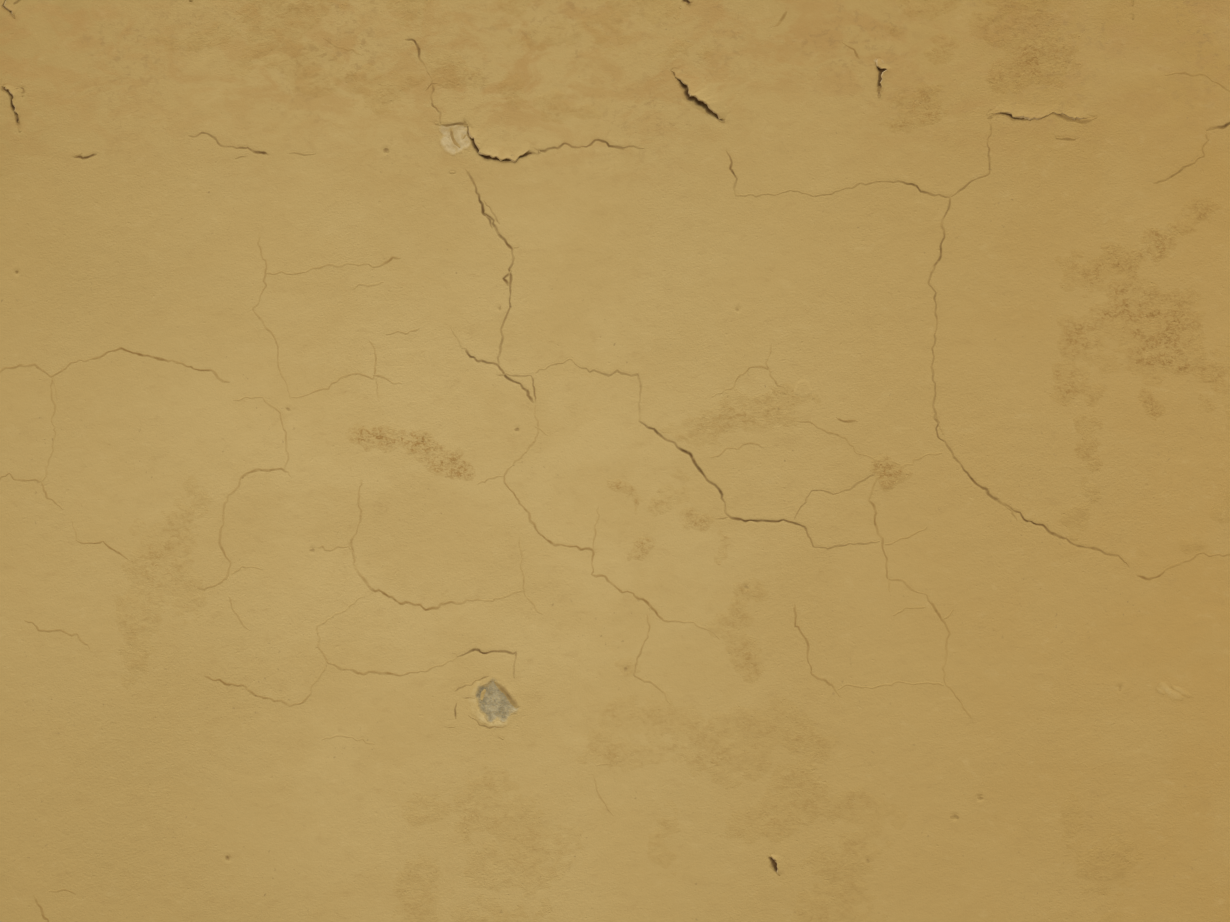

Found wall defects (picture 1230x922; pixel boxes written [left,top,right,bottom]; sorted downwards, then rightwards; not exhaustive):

peeling [0,85,26,132]
peeling [670,65,737,123]
crack [74,152,97,160]
peeling [435,120,541,174]
crack [0,233,420,630]
crack [188,121,1230,740]
spalling [468,676,519,730]